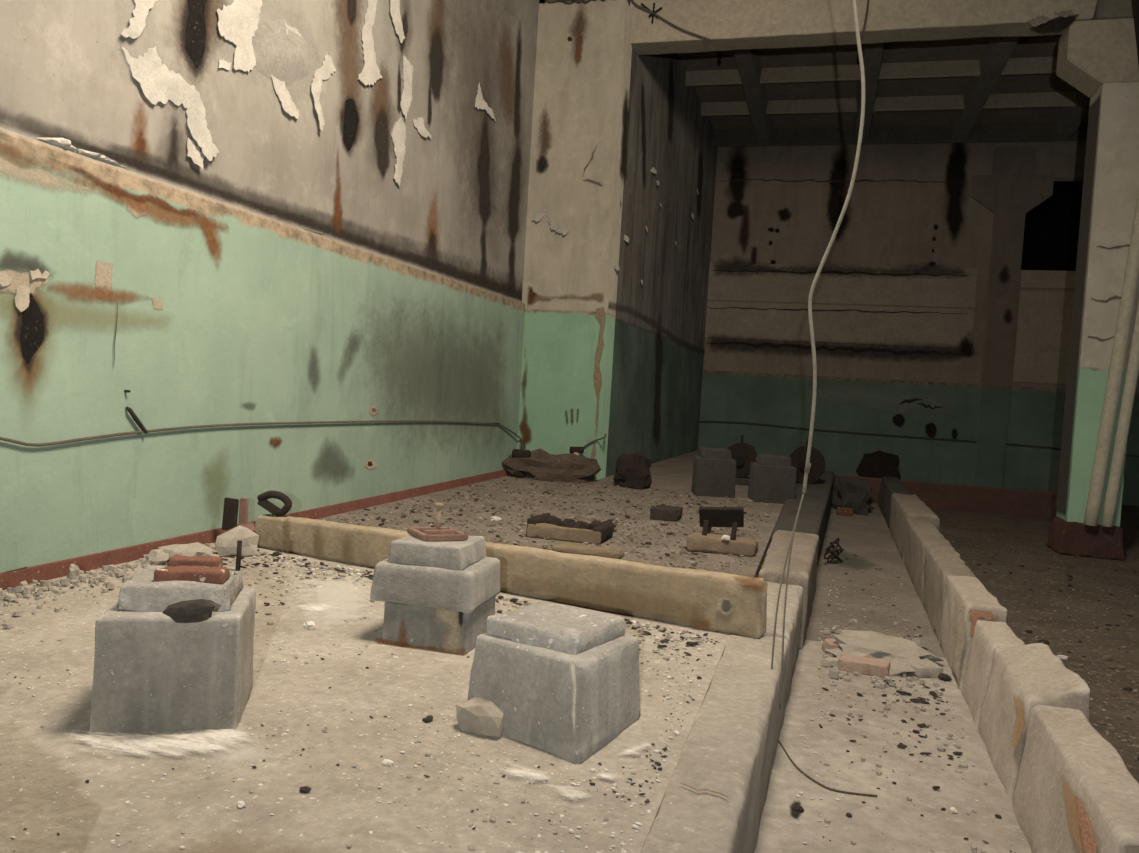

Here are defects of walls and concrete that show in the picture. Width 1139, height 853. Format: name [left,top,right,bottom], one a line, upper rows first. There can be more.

corrosion [568,12,585,62]
corrosion [133,111,147,156]
corrosion [74,167,223,257]
peeling [120,0,220,170]
peeling [358,0,432,186]
leakage [478,122,490,223]
leakage [508,148,521,240]
leakage [946,146,966,237]
spalling [0,253,50,381]
corrosion [54,285,135,301]
leakage [310,355,318,384]
leakage [318,448,347,477]